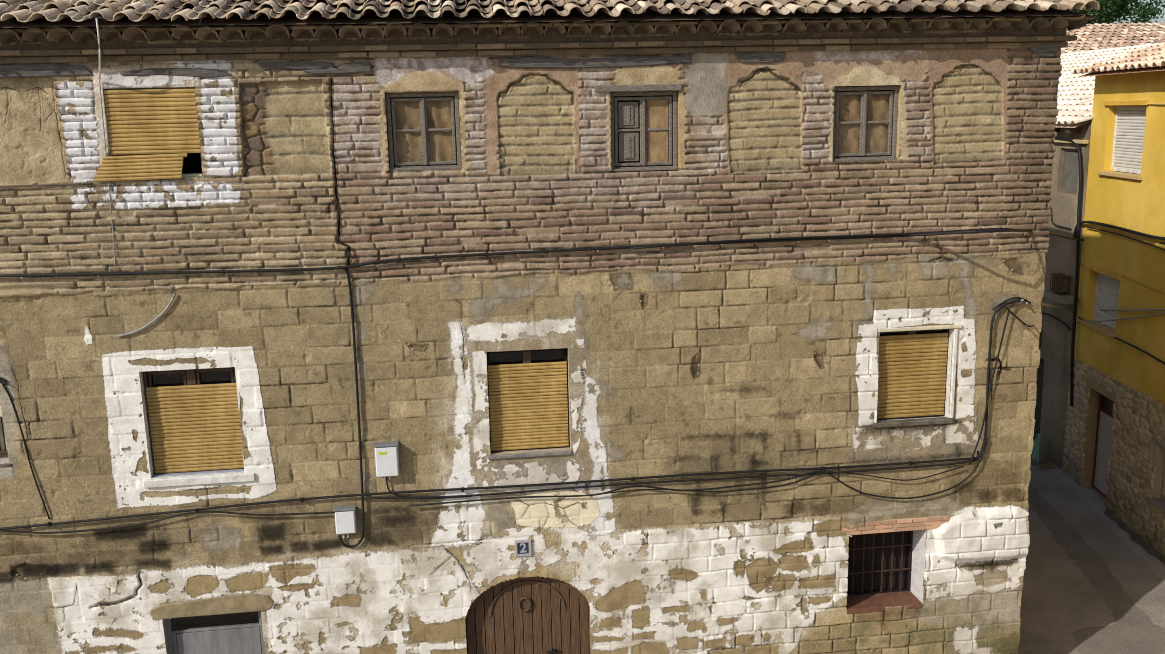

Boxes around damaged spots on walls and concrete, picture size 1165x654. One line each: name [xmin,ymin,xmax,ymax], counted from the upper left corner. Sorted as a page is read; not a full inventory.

peeling [57,60,241,211]
peeling [852,306,978,451]
peeling [10,317,852,654]
crack [519,500,588,527]
leakage [0,562,111,582]
leakage [94,525,169,568]
leakage [258,525,340,555]
peeling [924,506,1026,602]
peeling [953,624,1001,654]